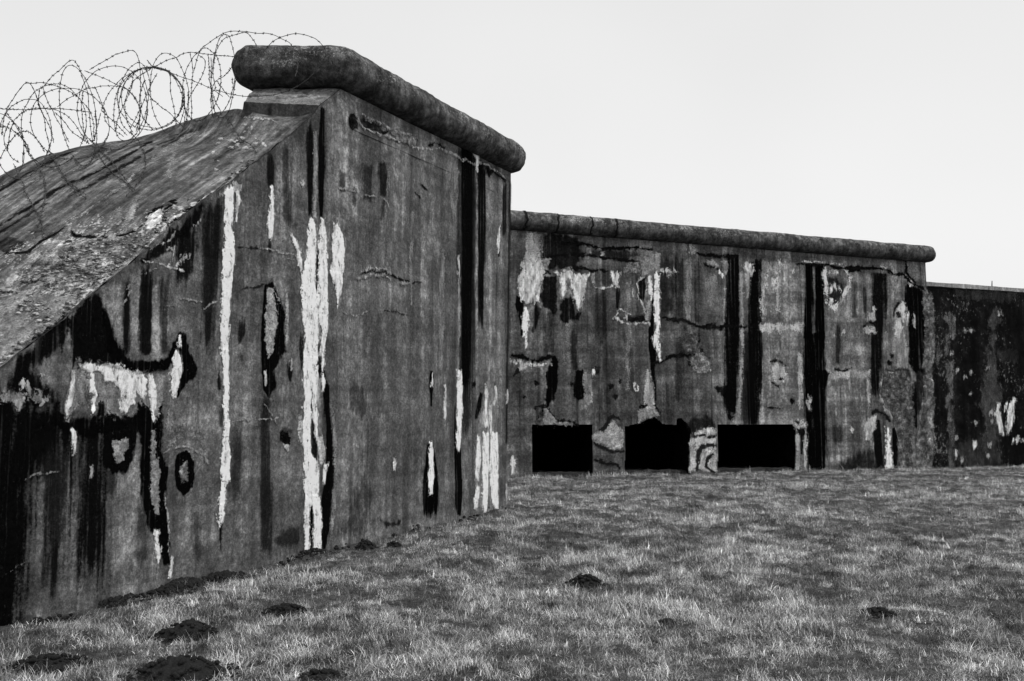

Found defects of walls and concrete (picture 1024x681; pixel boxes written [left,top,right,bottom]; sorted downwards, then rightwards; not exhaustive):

spalling [63,357,170,423]
damp [0,180,245,626]
spalling [261,282,290,398]
crack [342,265,421,317]
damp [429,148,693,516]
spalling [541,233,676,326]
damp [714,253,1002,470]
crack [797,260,926,291]
damp [955,289,1020,412]
peeling [954,397,1024,464]